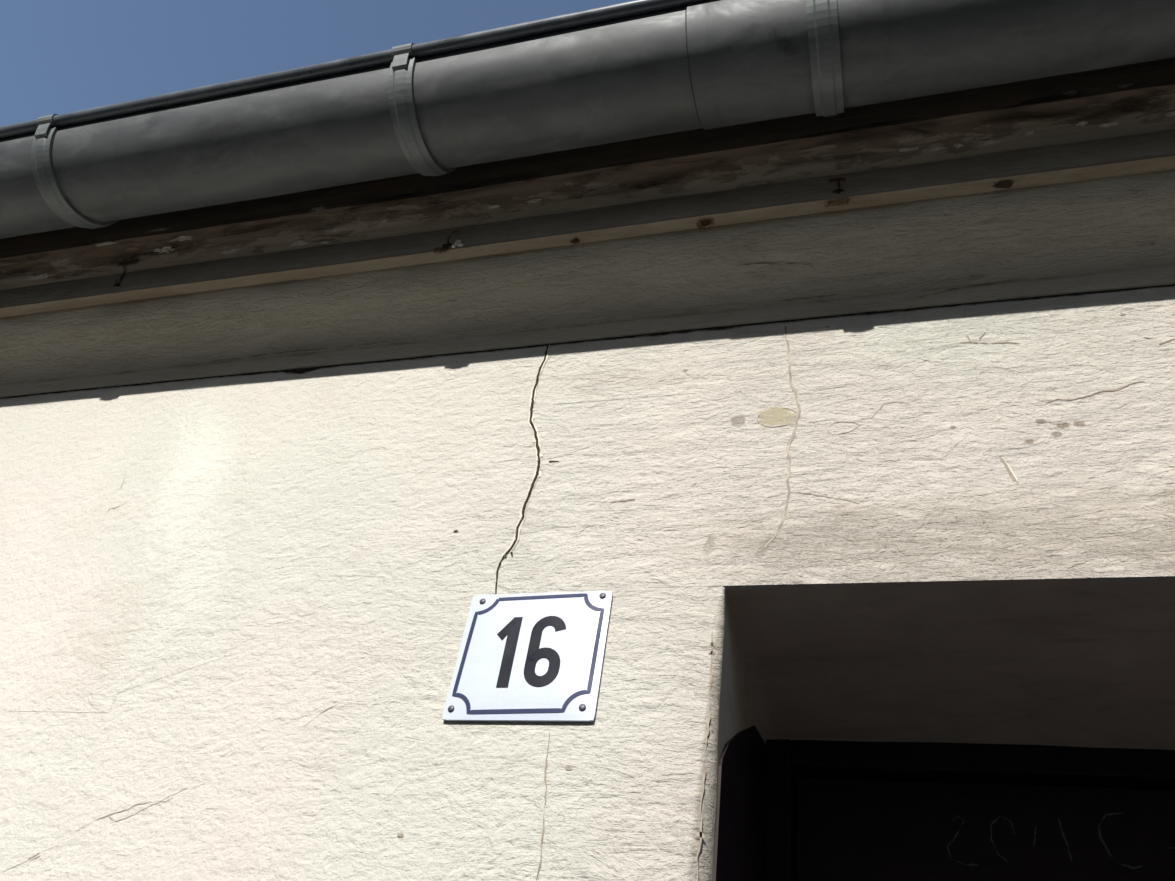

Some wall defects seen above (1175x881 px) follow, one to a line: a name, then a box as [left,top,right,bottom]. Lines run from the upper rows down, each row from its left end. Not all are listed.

damp [989,90,1165,122]
crack [0,275,1175,594]
crack [2,782,205,872]
crack [536,732,550,880]